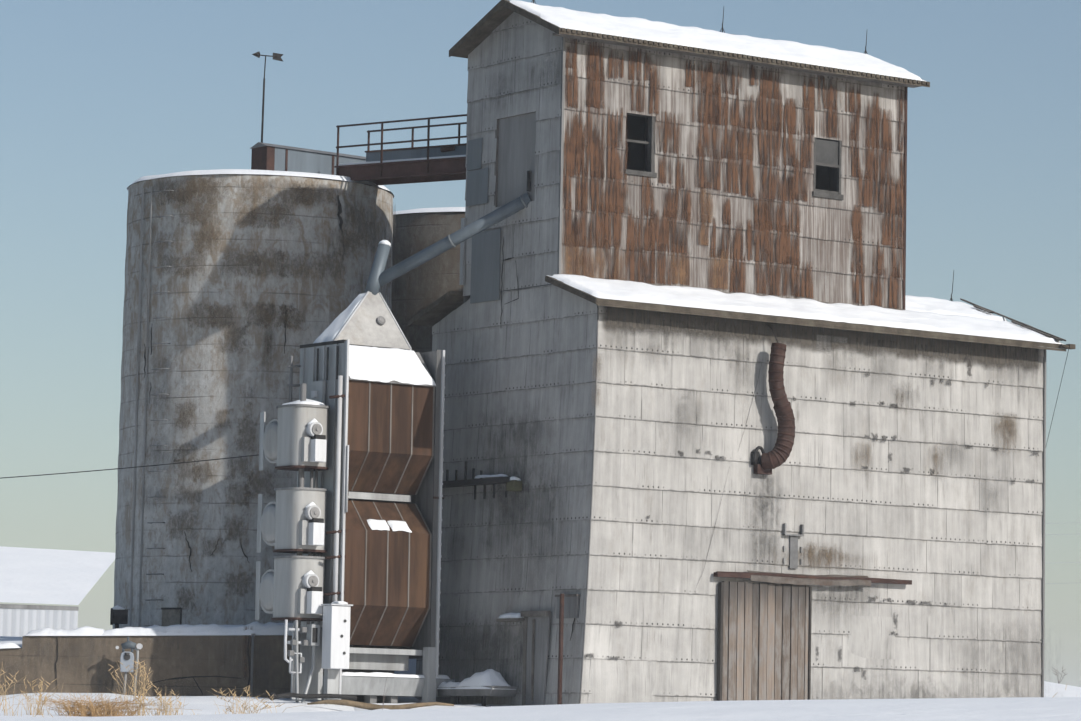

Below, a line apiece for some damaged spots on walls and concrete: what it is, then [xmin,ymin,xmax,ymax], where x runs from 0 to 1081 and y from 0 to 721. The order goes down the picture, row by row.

crack [337,195,345,262]
rust [563,39,905,309]